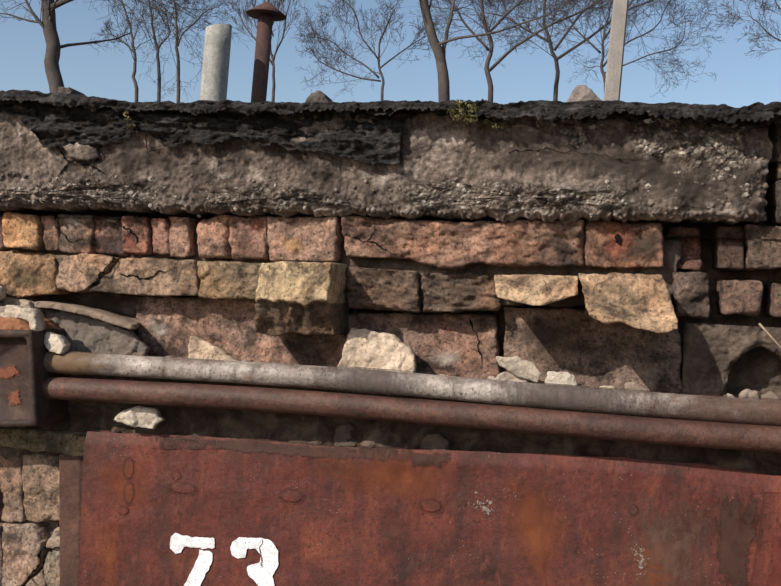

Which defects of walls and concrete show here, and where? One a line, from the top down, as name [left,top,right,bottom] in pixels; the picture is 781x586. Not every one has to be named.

crack [55,144,105,184]
crack [84,226,173,291]
crack [470,320,482,373]
corrosion [688,396,781,426]
crack [20,547,60,586]